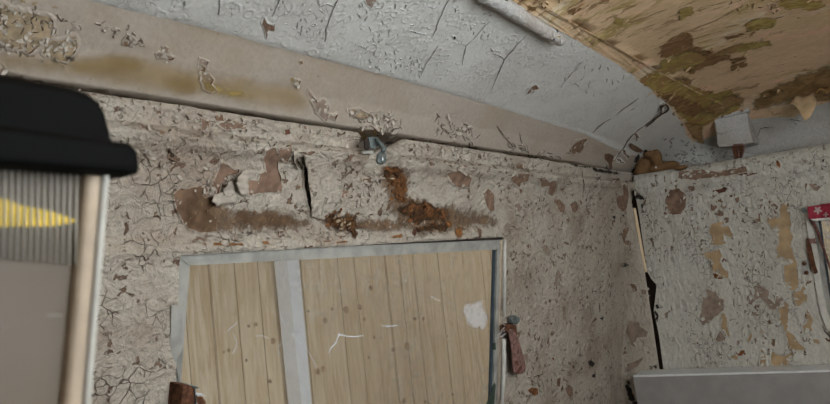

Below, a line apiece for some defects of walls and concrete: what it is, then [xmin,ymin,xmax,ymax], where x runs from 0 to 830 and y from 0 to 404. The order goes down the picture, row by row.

peeling [0,0,81,75]
peeling [725,17,776,40]
peeling [773,0,826,11]
peeling [199,114,249,132]
crack [558,54,624,96]
peeling [656,92,703,118]
peeling [171,126,318,235]
corrosion [318,208,379,243]
corrosion [382,166,463,238]
crack [98,98,830,404]
peeling [595,132,645,247]
peeling [661,160,830,367]